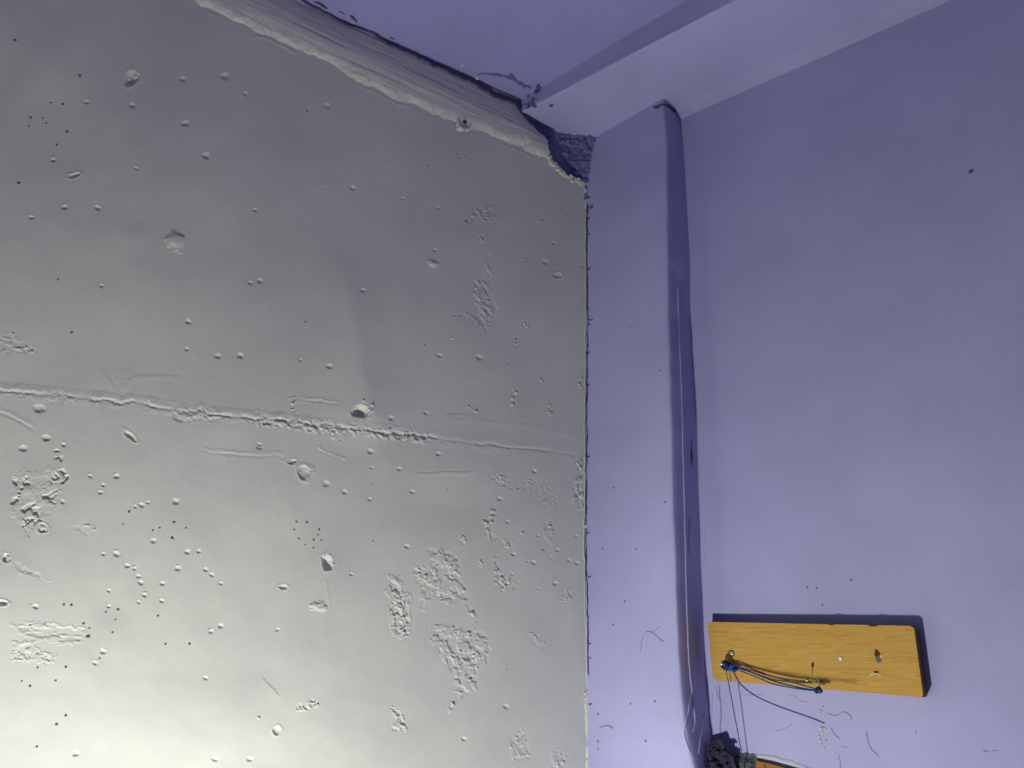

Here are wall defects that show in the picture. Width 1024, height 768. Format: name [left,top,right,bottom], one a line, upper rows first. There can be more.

peeling [477,73,540,93]
flaking render [534,121,596,209]
peeling [7,431,70,538]
crack [0,196,593,675]
peeling [9,602,87,666]
peeling [383,547,493,718]